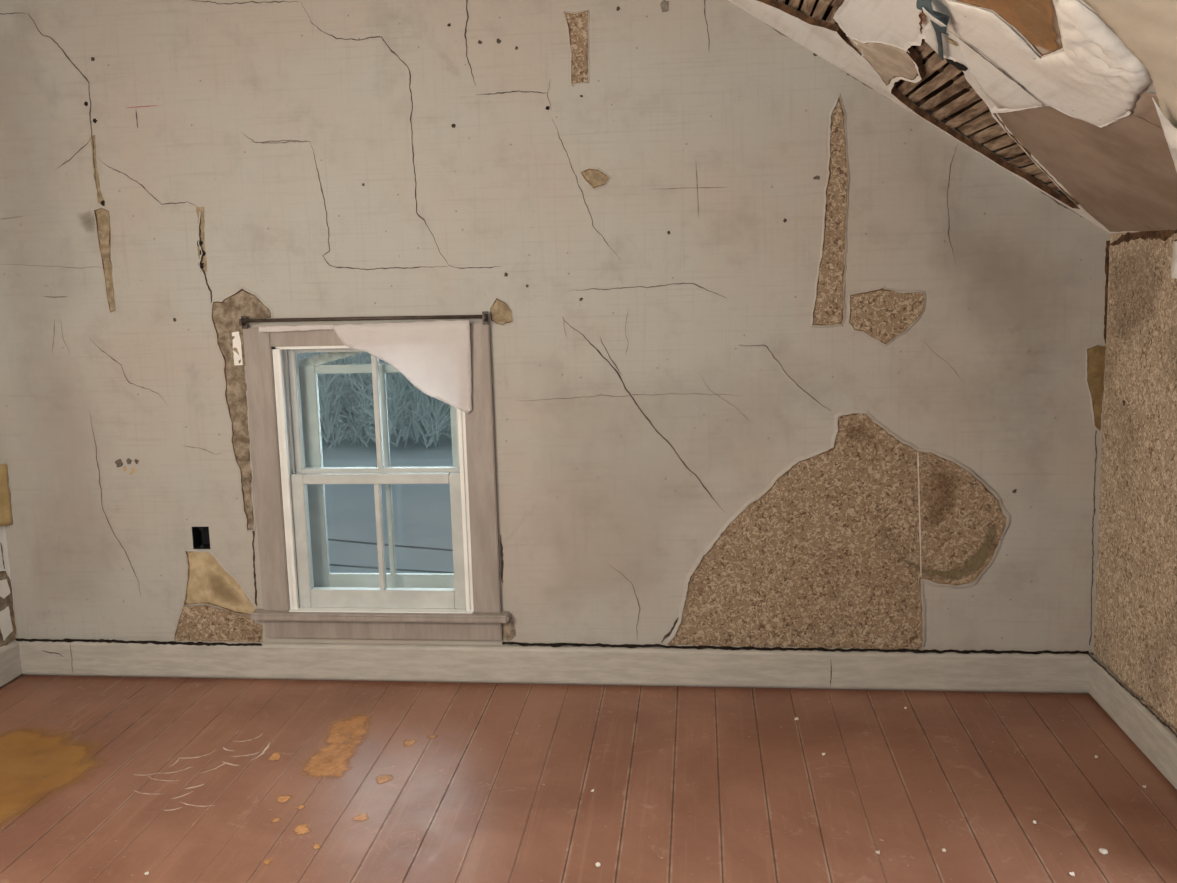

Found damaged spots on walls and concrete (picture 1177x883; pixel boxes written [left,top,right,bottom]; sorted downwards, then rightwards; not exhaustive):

peeling [93,200,117,313]
crack [1,13,212,308]
crack [90,415,141,593]
crack [90,339,166,403]
flaking render [173,549,263,642]
flaking render [210,286,273,532]
crack [193,0,501,270]
peeling [563,9,590,86]
crack [464,0,751,508]
peeling [667,409,1011,650]
peeling [810,93,927,347]
peeling [756,0,1177,279]